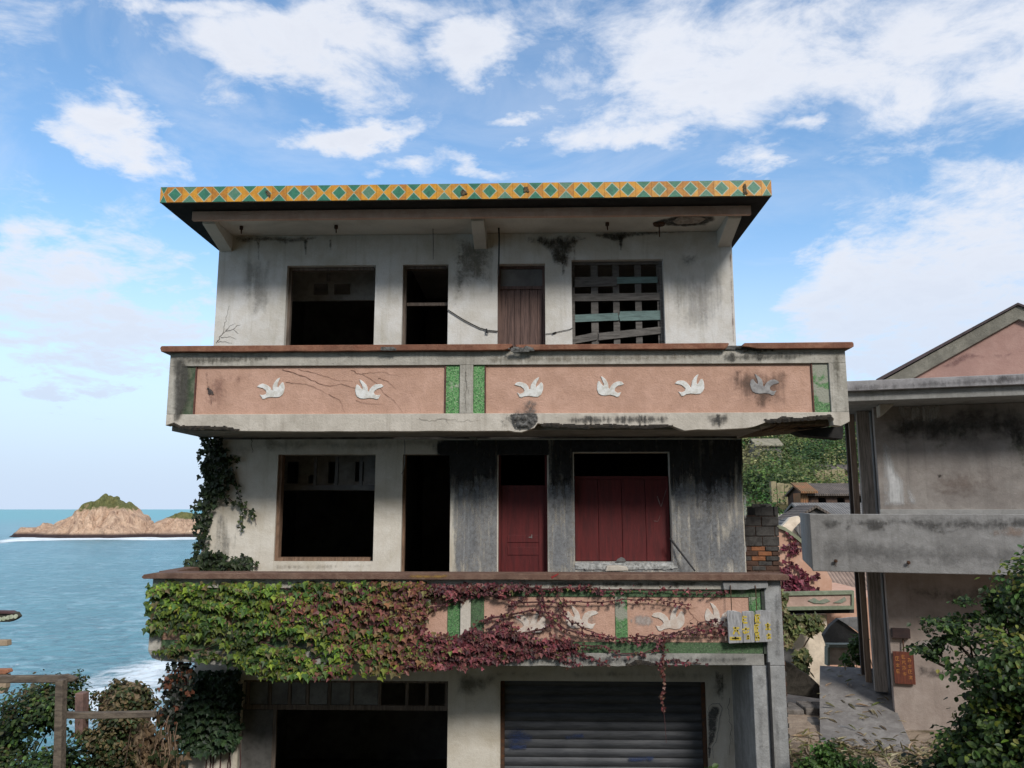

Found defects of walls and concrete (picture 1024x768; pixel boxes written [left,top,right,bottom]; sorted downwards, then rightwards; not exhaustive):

water stain [537,236,577,264]
crack [282,369,476,426]
spalling [511,413,673,430]
spalling [764,414,834,423]